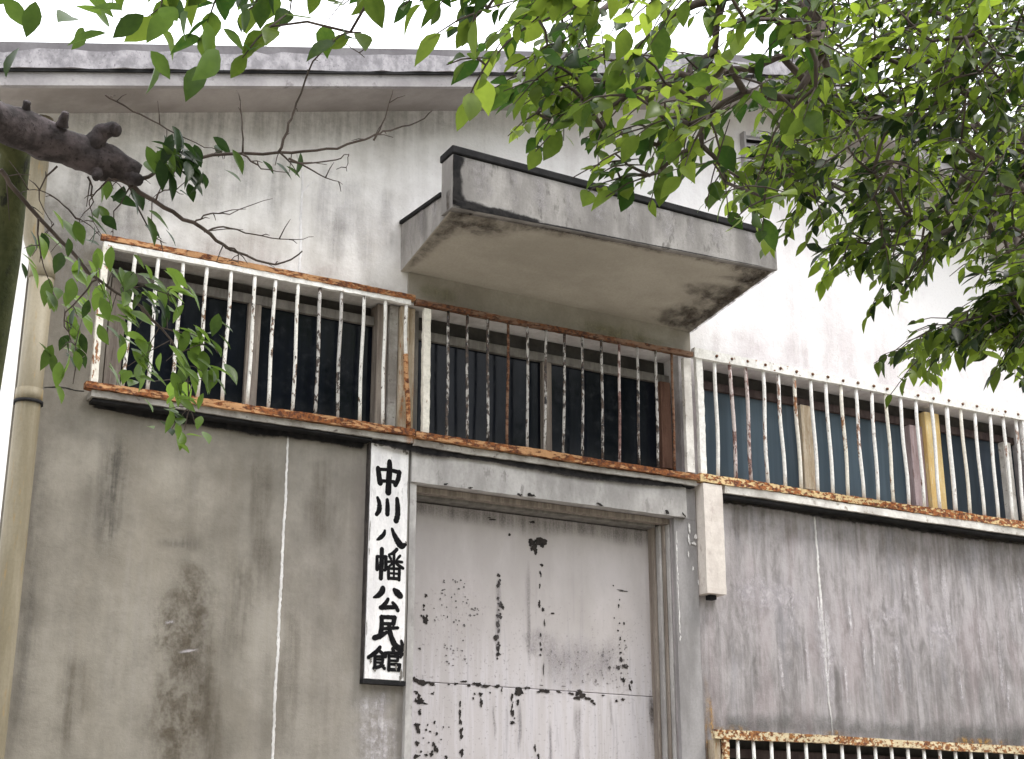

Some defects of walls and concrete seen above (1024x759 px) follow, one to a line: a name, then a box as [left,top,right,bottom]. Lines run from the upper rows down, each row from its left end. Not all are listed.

water stain [423,154,769,325]
water stain [723,500,1024,545]
peeling [395,537,633,759]